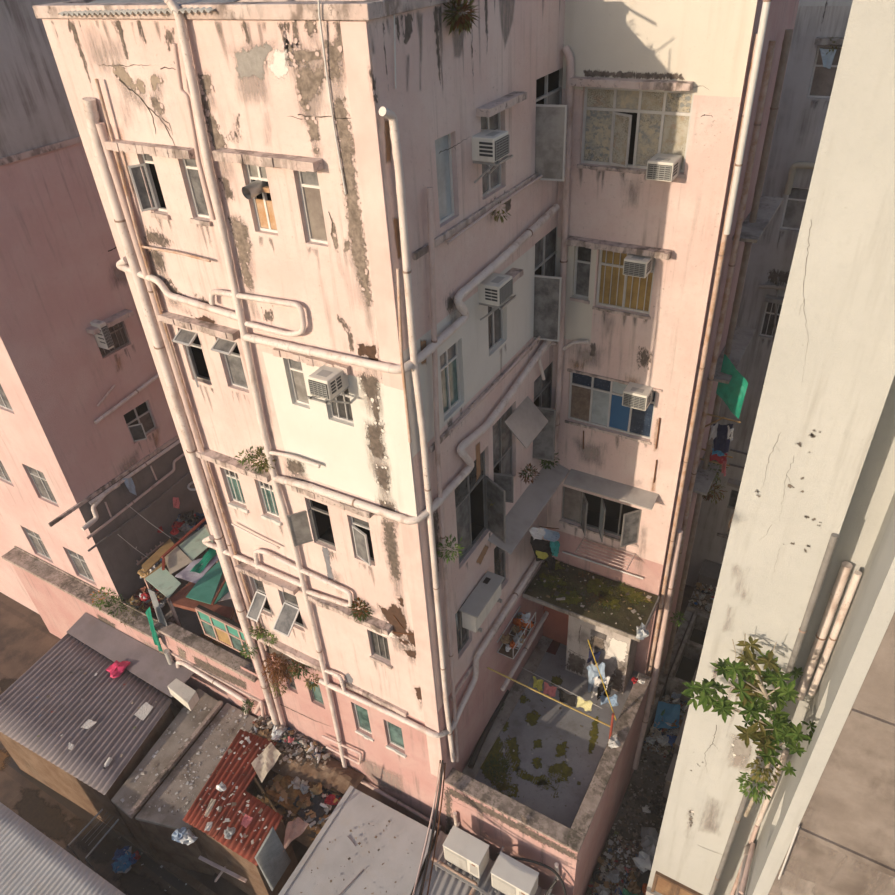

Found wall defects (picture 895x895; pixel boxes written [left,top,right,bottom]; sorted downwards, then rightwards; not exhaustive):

peeling [234,41,273,96]
crack [99,61,176,143]
water stain [145,222,171,249]
water stain [637,346,652,369]